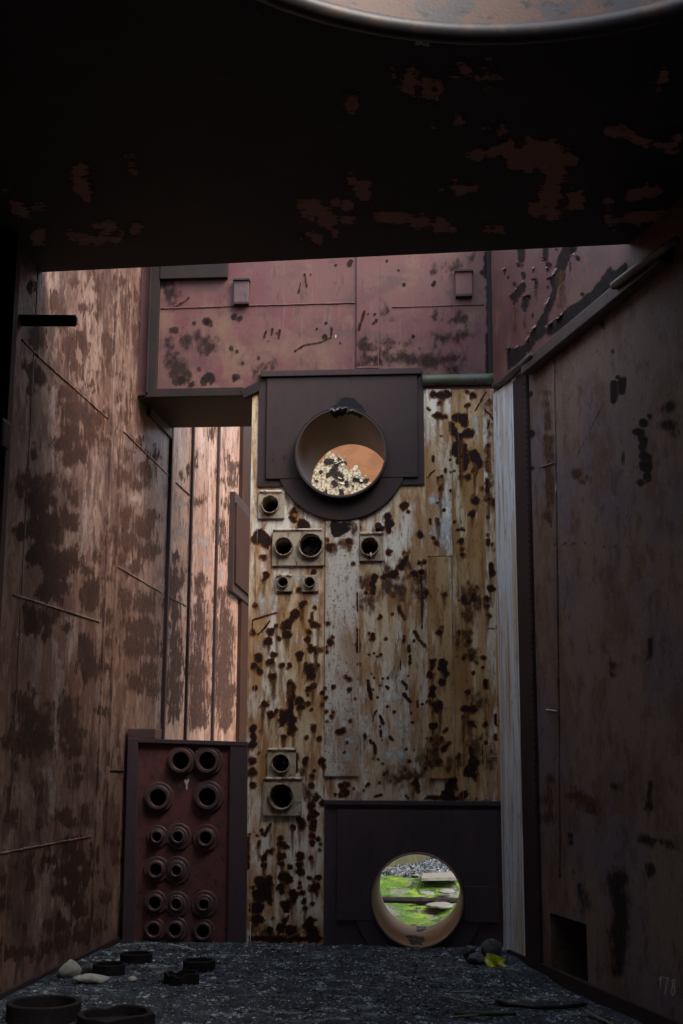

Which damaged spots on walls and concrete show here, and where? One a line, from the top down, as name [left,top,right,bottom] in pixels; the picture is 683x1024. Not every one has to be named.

peeling [389,56,507,105]
peeling [295,172,457,246]
peeling [465,120,586,222]
peeling [501,247,627,379]
leakage [45,386,61,474]
corrosion [430,389,495,526]
leakage [77,492,95,562]
leakage [172,526,227,581]
corrosion [382,501,411,534]
corrosion [1,270,389,944]
corrosion [356,533,499,801]
leakage [38,615,78,824]